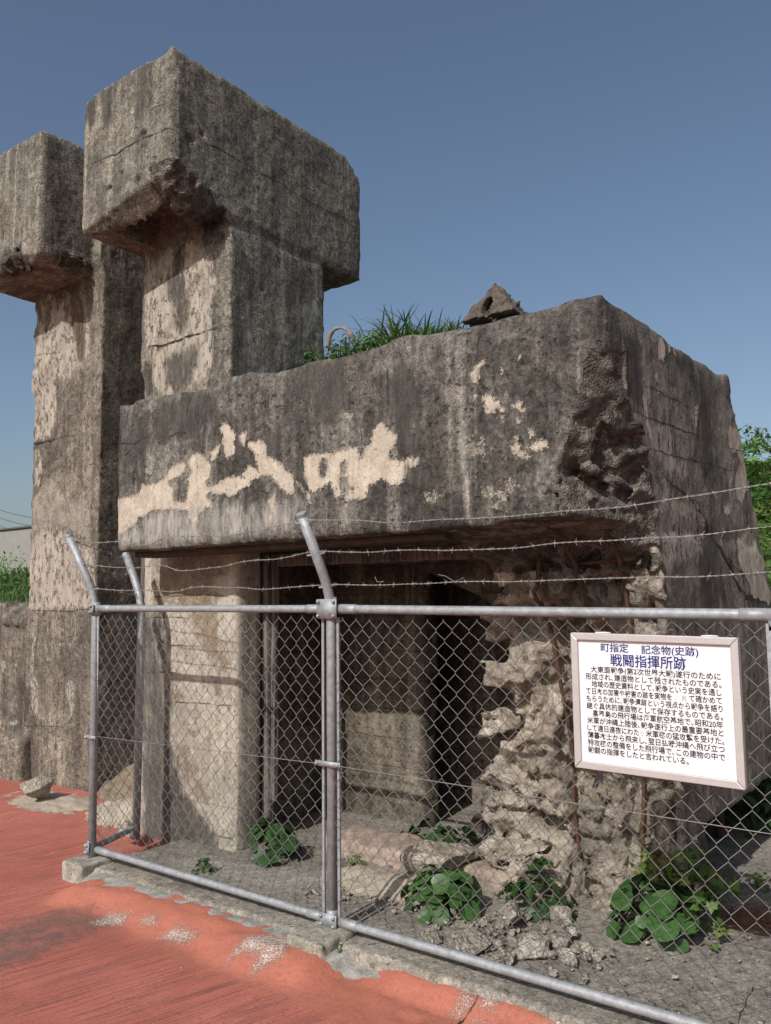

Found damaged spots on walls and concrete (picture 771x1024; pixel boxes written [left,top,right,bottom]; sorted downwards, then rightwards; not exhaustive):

spalling [0,243,35,277]
spalling [58,250,102,282]
peeling [143,157,230,399]
crack [149,315,229,354]
peeling [118,421,420,536]
crack [620,337,769,607]
peeling [723,425,747,516]
peeling [736,530,771,605]
spalling [444,351,703,916]